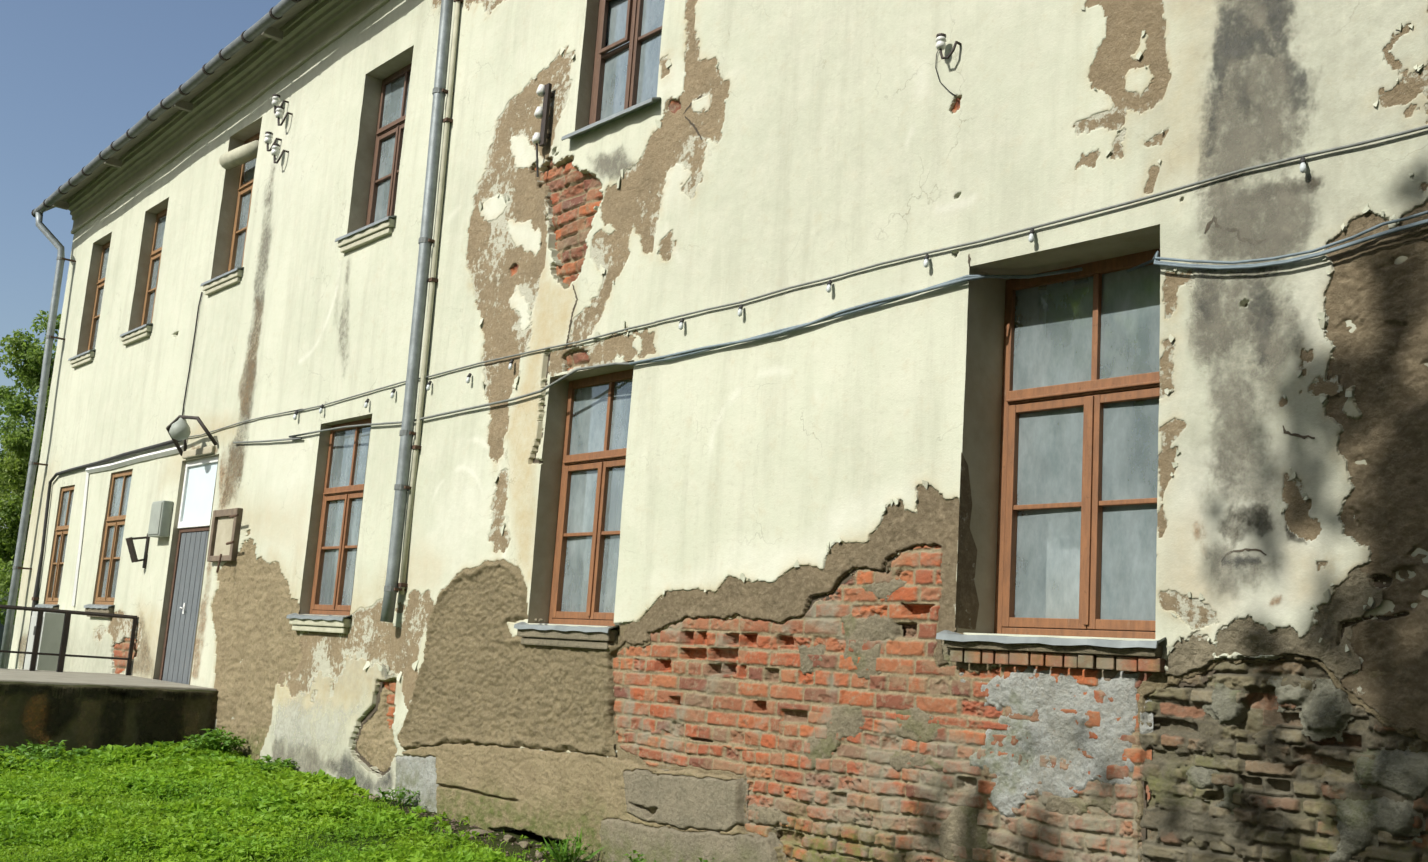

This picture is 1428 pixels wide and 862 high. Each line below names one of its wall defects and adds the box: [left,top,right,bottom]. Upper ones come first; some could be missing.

leakage [224,227,271,501]
peeling [465,0,730,463]
peeling [1073,0,1172,170]
peeling [1144,129,1169,194]
leakage [1193,0,1320,590]
peeling [1373,23,1428,124]
peeling [94,610,143,674]
flaking render [211,202,1428,862]